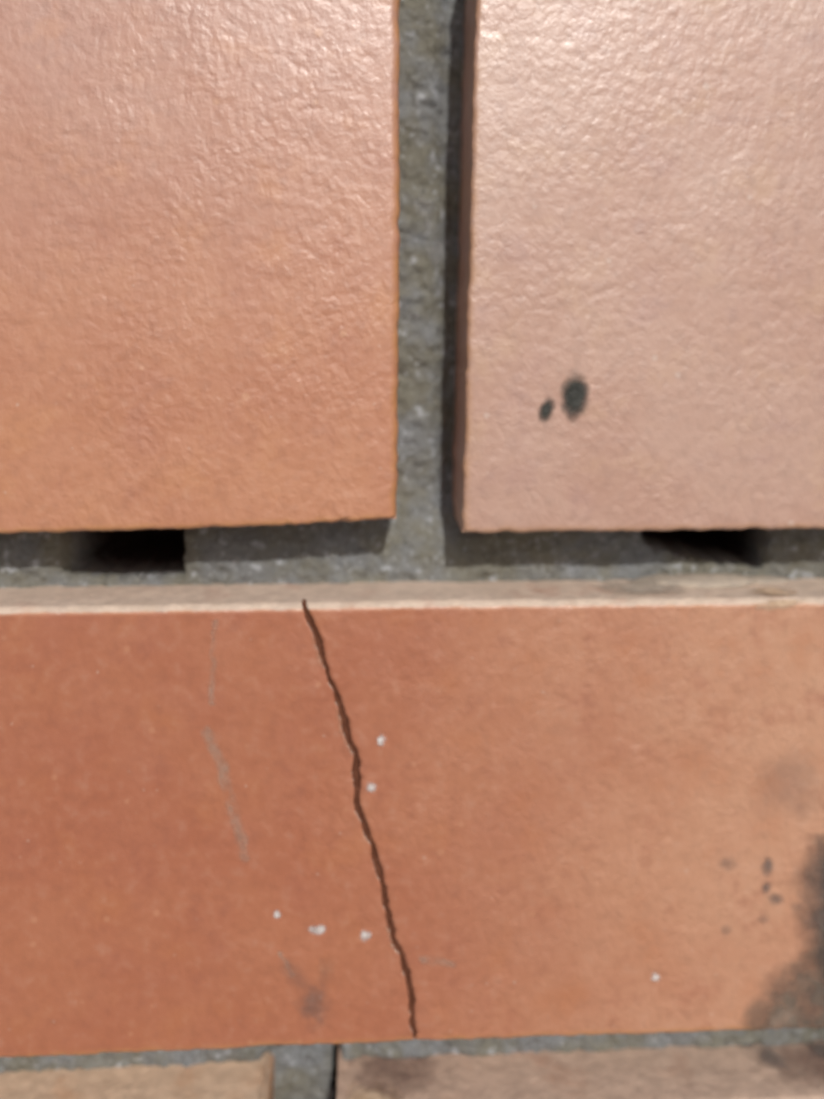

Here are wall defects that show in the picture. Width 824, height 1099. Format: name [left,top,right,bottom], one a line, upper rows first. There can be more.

water stain [540,379,587,419]
crack [302,599,417,1037]
water stain [746,844,824,1064]